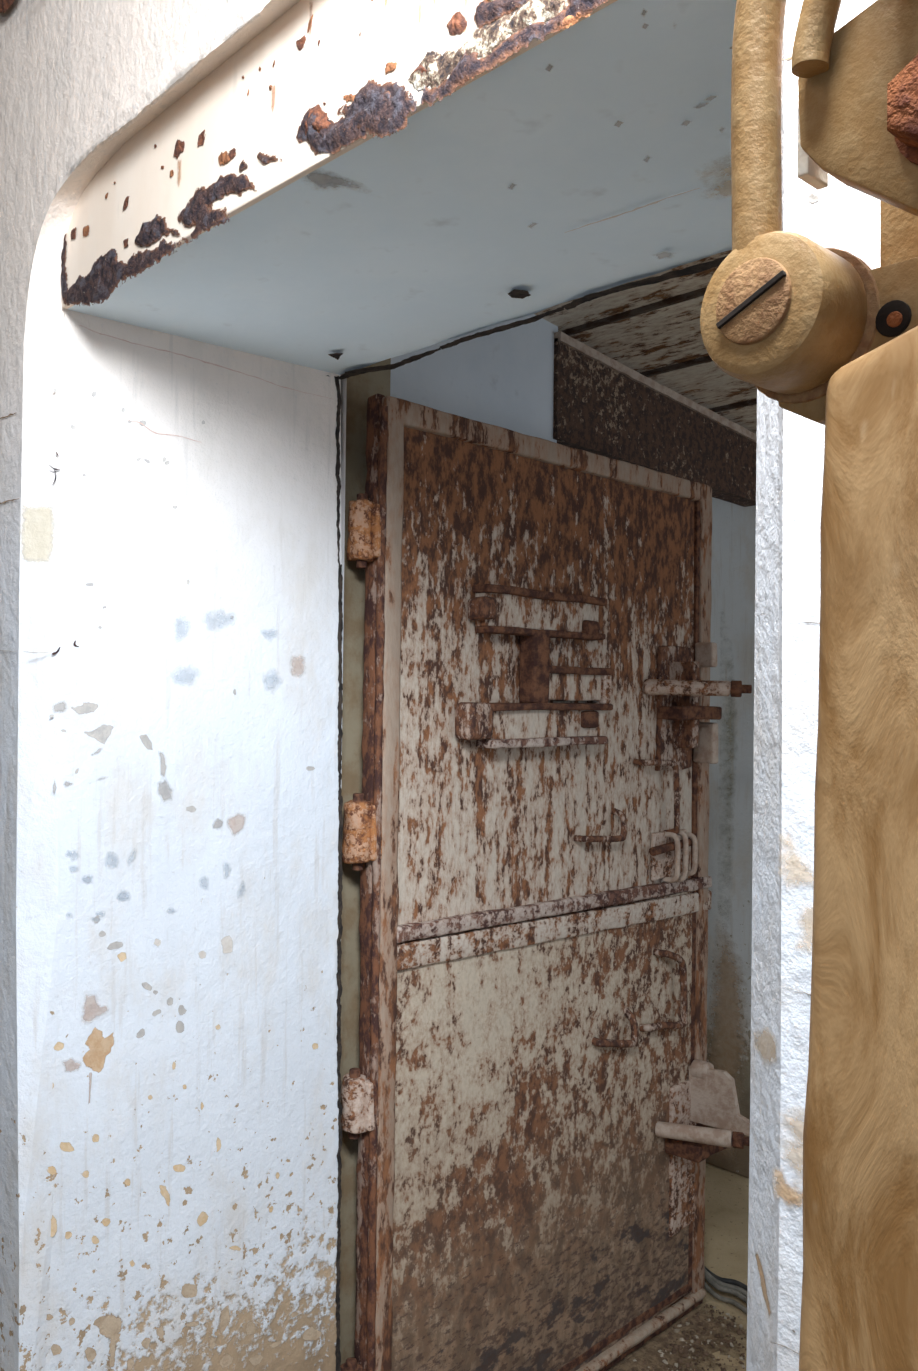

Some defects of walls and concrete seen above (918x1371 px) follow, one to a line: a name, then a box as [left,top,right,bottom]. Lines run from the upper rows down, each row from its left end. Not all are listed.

corrosion [296,5,320,50]
corrosion [242,60,275,110]
corrosion [296,62,409,155]
corrosion [161,130,206,184]
corrosion [61,148,283,306]
peeling [758,1032,775,1058]
peeling [756,1254,770,1315]